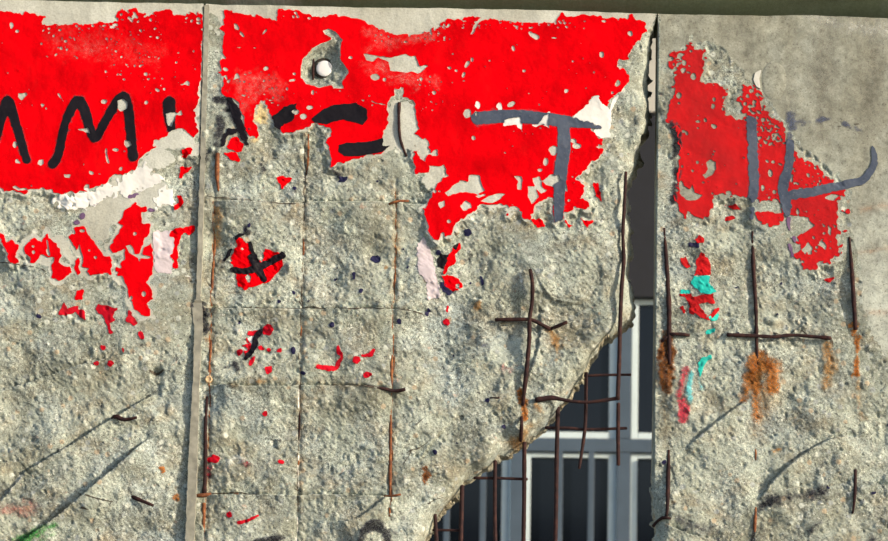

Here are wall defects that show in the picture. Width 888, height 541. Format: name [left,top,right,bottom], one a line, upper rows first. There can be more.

spalling [0,7,656,541]
spalling [649,16,888,541]
rust [511,388,541,450]
rust [656,331,677,420]
rust [741,351,782,422]
rust [822,341,839,388]
rust [848,322,862,389]